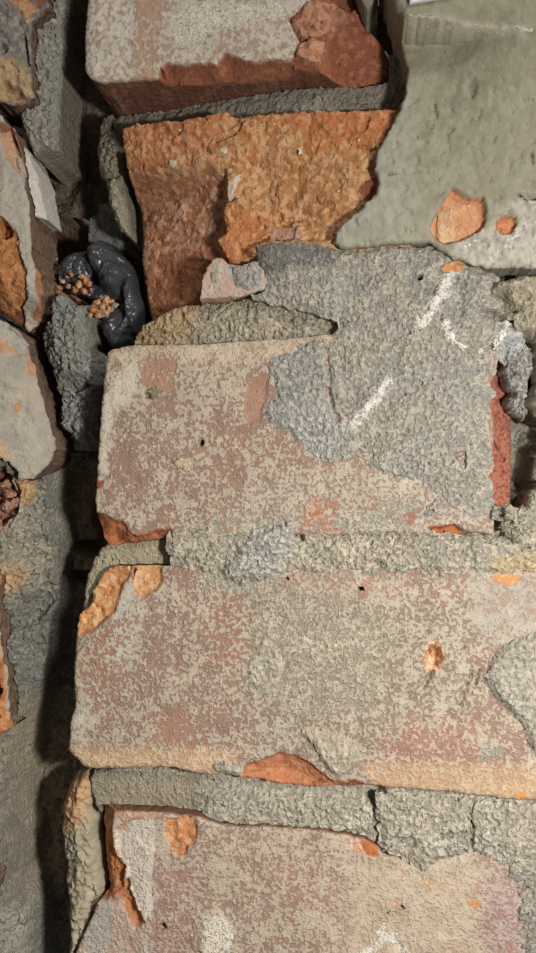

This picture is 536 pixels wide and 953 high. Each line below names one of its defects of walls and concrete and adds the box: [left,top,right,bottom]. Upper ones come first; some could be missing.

spalling [284,0,388,89]
flaking render [403,13,534,49]
spalling [428,188,518,244]
spalling [440,260,466,273]
spalling [98,513,170,544]
spalling [76,565,163,639]
spalling [243,752,370,786]
spalling [104,804,126,899]
spalling [165,816,196,854]